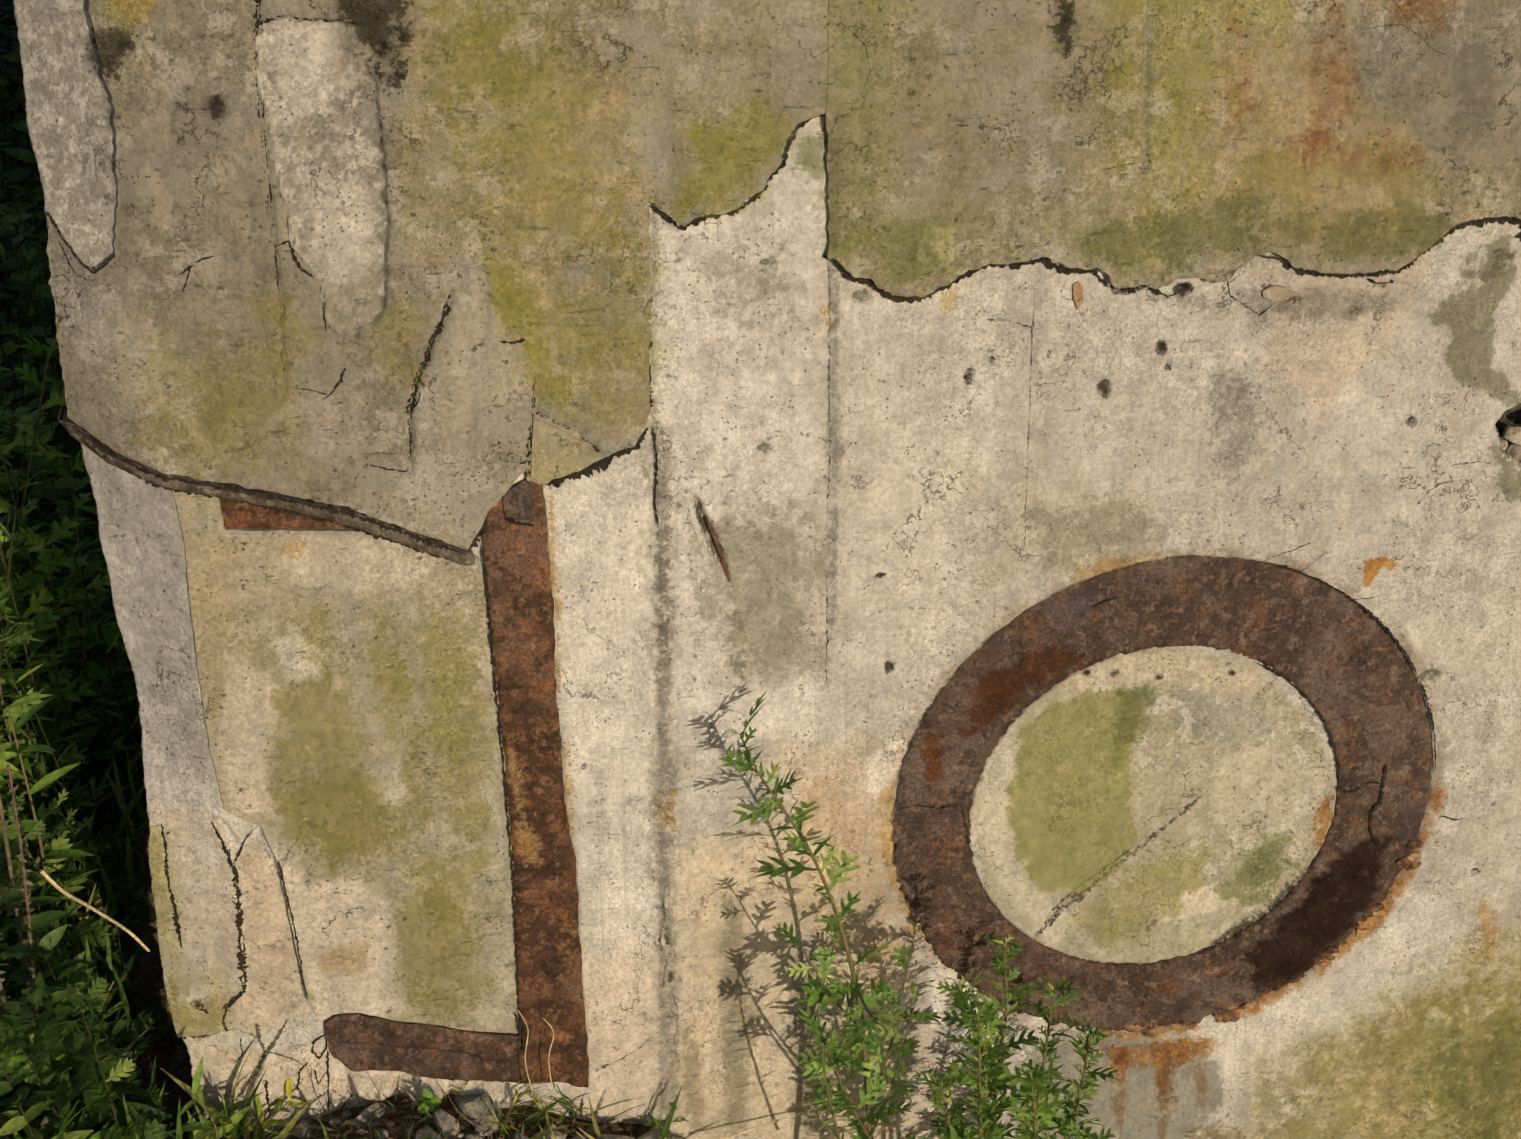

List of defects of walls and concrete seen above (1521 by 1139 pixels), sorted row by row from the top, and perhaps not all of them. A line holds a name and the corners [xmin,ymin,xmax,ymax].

crack [252,0,361,400]
peeling [46,0,1521,550]
crack [501,337,525,345]
spalling [697,507,731,582]
corrosion [1366,562,1393,582]
crack [70,341,659,1054]
crack [1034,790,1208,940]
corrosion [1355,839,1423,938]
crack [180,821,352,1118]
corrosion [1180,1002,1260,1031]
corrosion [1320,945,1339,967]